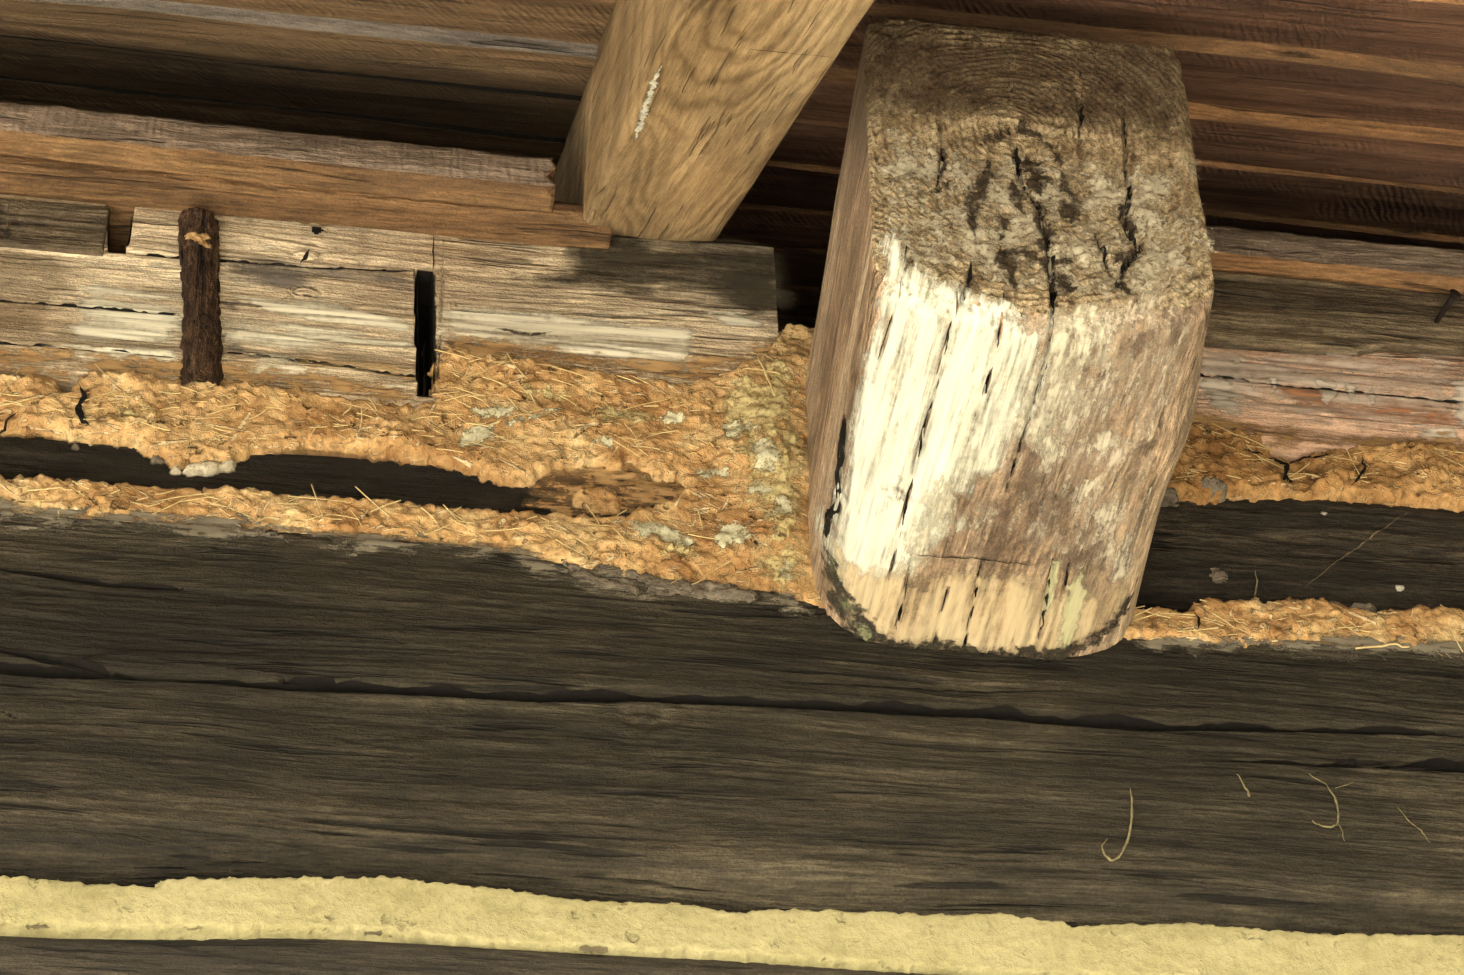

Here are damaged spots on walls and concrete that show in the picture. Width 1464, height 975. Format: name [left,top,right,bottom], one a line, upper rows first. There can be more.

crack [1074,54,1085,137]
crack [1006,83,1057,489]
crack [1095,118,1141,288]
crack [0,648,1464,773]